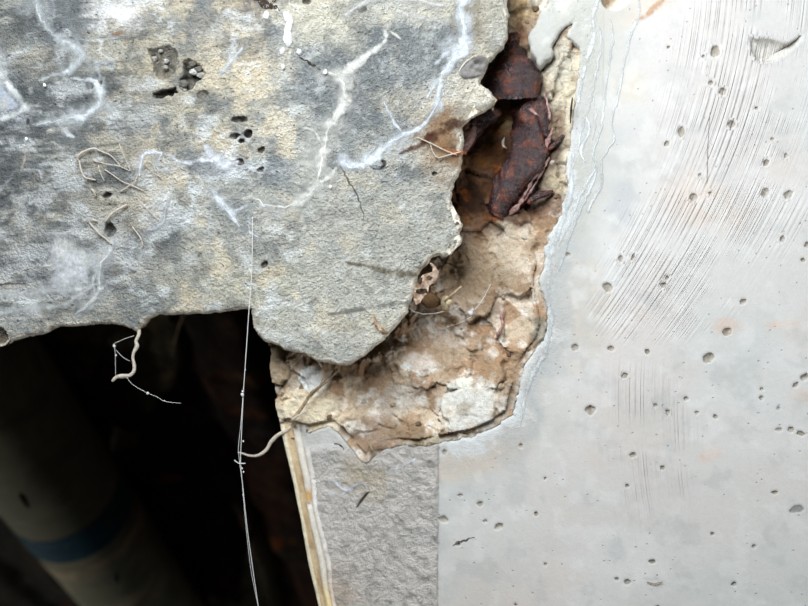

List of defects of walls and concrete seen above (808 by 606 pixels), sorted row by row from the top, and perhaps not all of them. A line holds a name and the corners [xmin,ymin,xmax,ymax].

spalling [268,0,581,463]
corrosion [399,32,565,220]